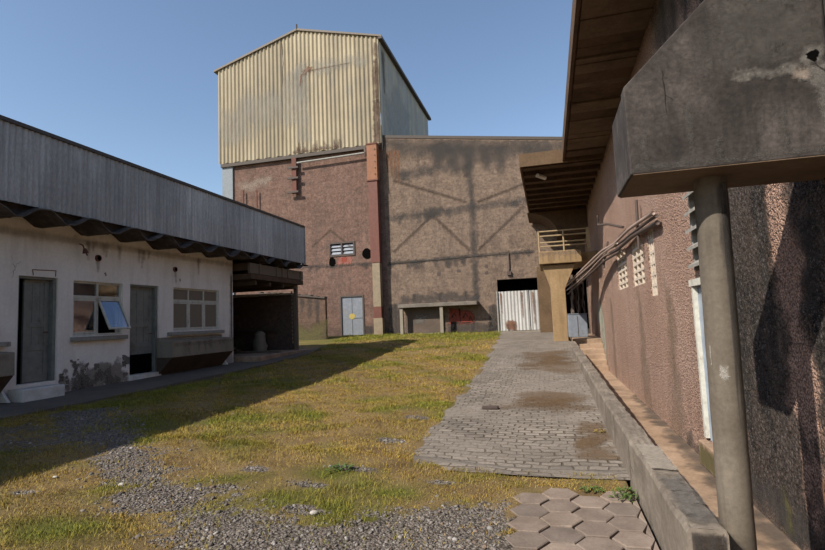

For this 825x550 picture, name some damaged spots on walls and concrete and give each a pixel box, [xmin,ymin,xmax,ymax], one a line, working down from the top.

damp [703,0,825,117]
spalling [804,46,823,63]
peeling [58,355,130,391]
damp [719,178,825,550]